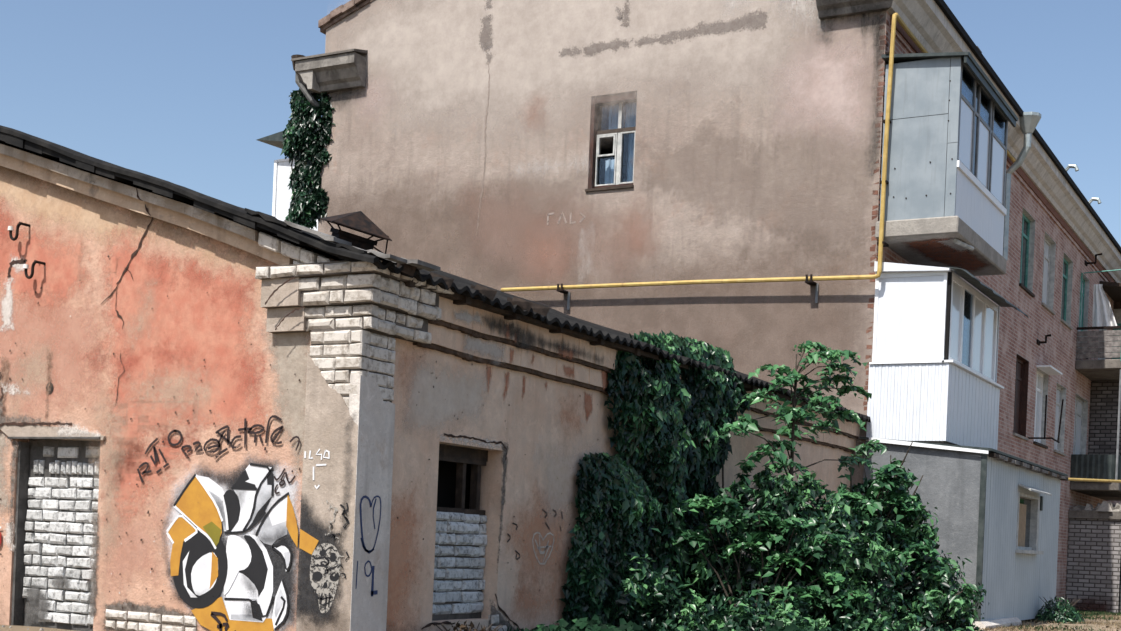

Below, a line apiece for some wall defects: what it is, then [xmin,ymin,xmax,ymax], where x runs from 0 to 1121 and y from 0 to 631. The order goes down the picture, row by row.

crack [101,187,153,328]
peeling [0,166,396,631]
peeling [465,337,504,369]
spalling [440,428,515,561]